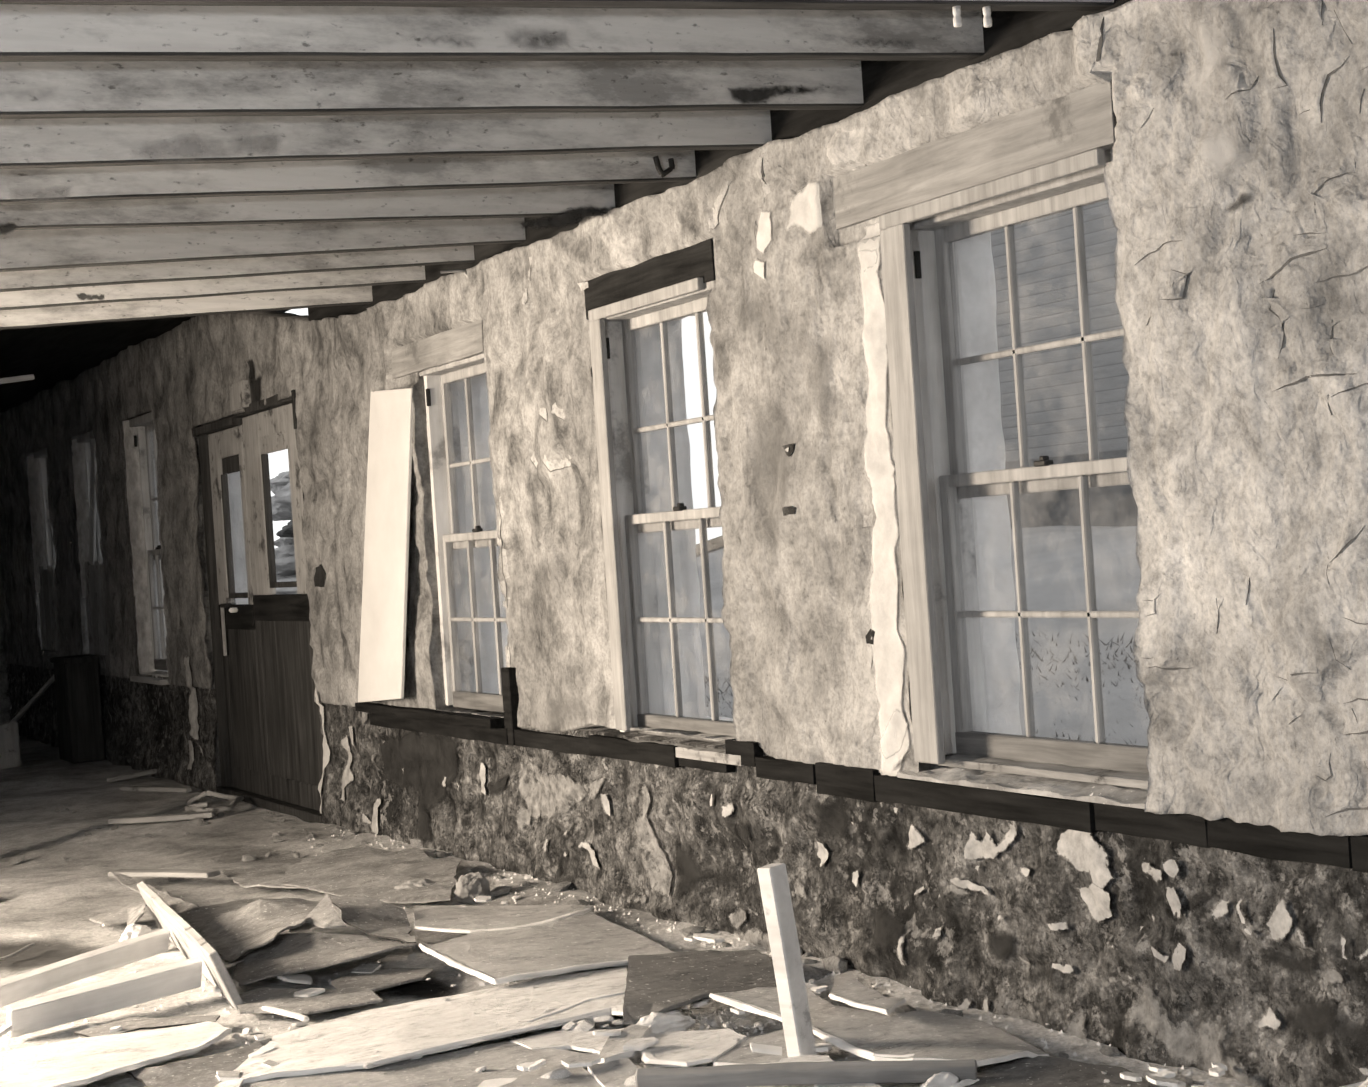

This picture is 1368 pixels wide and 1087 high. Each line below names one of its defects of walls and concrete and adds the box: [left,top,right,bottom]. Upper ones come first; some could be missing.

leakage [730,86,811,104]
crack [1134,104,1154,127]
crack [1223,0,1368,124]
flaking render [754,182,835,279]
crack [1132,217,1196,326]
crack [1255,153,1368,416]